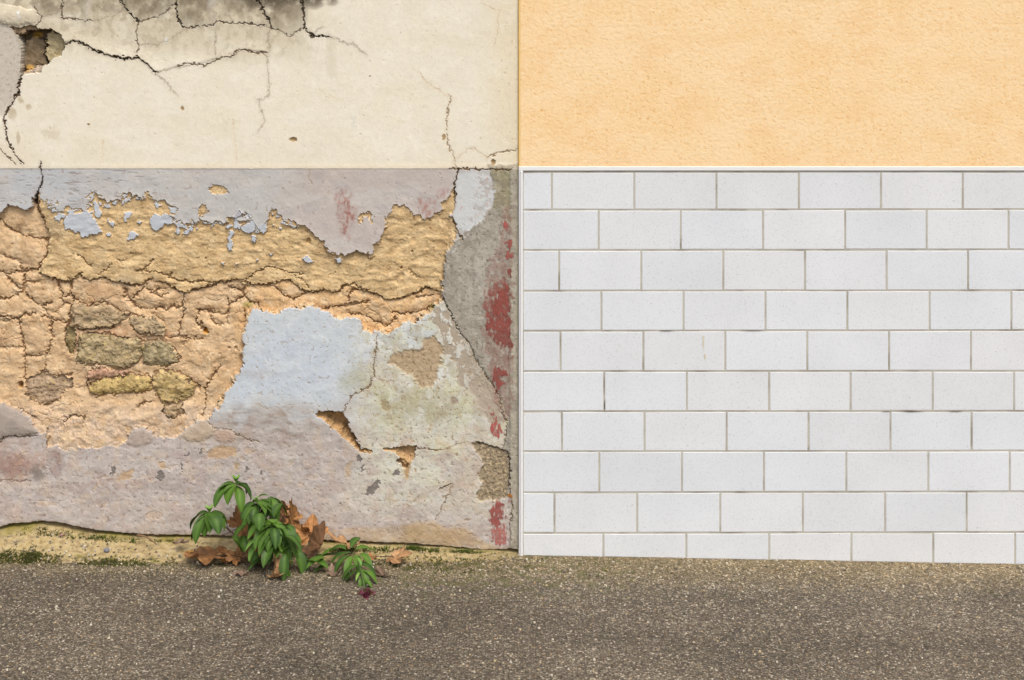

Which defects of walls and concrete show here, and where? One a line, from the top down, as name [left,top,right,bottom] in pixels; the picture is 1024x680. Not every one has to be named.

crack [0,78,44,204]
peeling [0,25,66,118]
crack [34,0,365,165]
crack [419,72,518,241]
spalling [0,185,458,452]
crack [342,336,397,413]
crack [416,297,514,539]